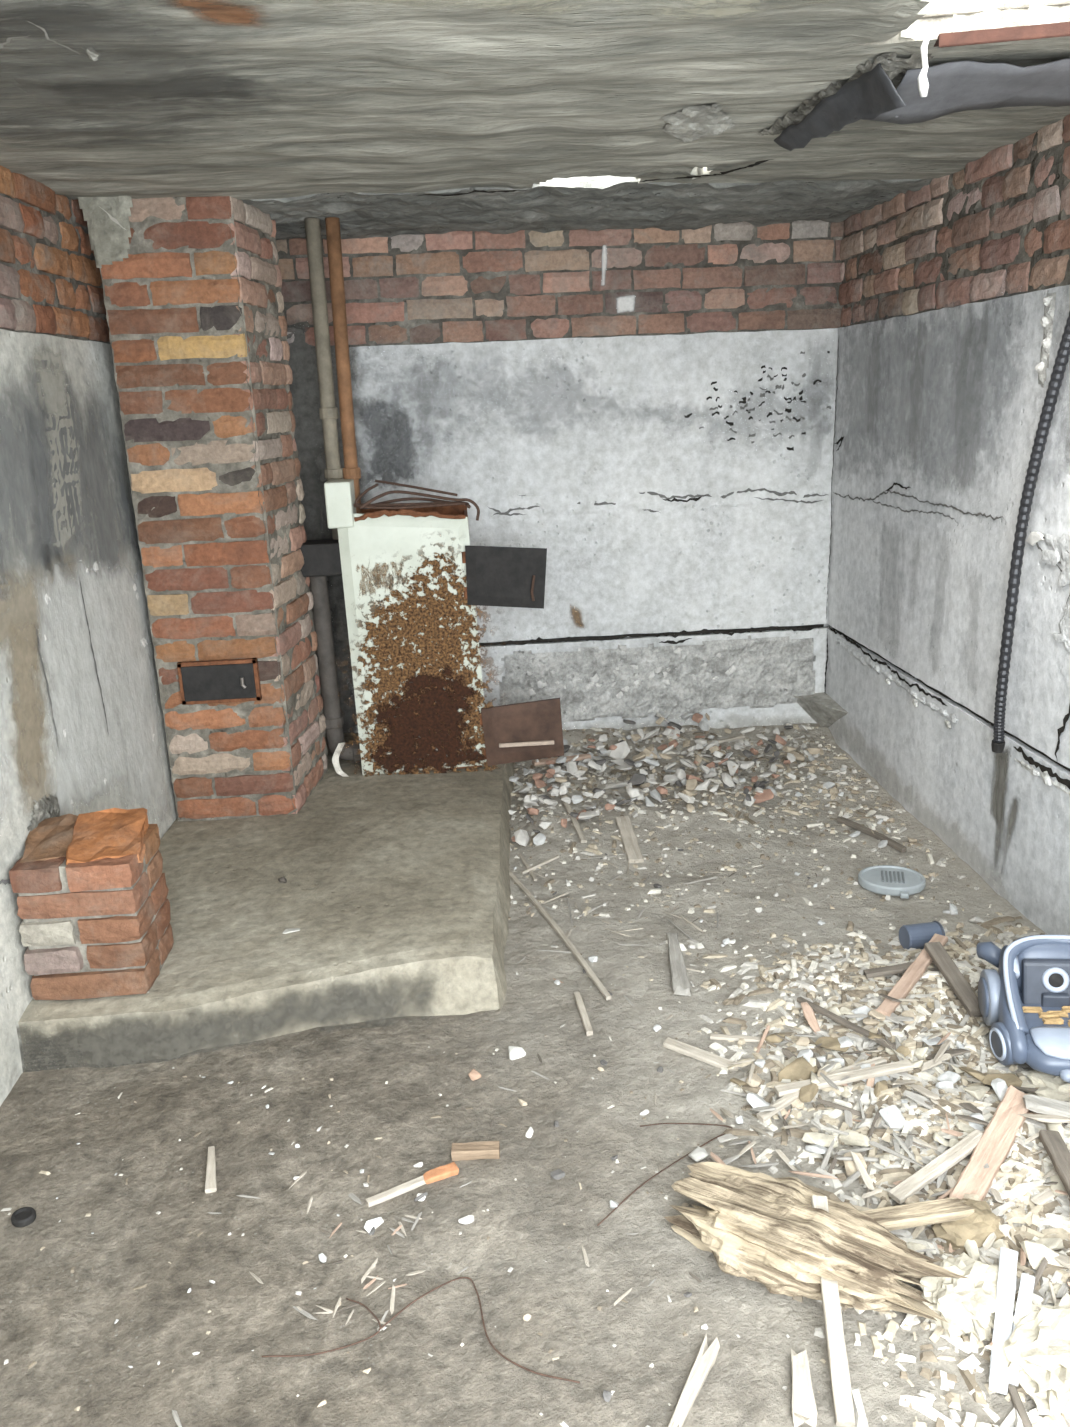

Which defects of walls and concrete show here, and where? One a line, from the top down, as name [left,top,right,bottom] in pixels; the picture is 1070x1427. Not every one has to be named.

spalling [759,53,934,136]
damp [0,352,140,807]
crack [479,339,1070,789]
spalling [1026,532,1070,653]